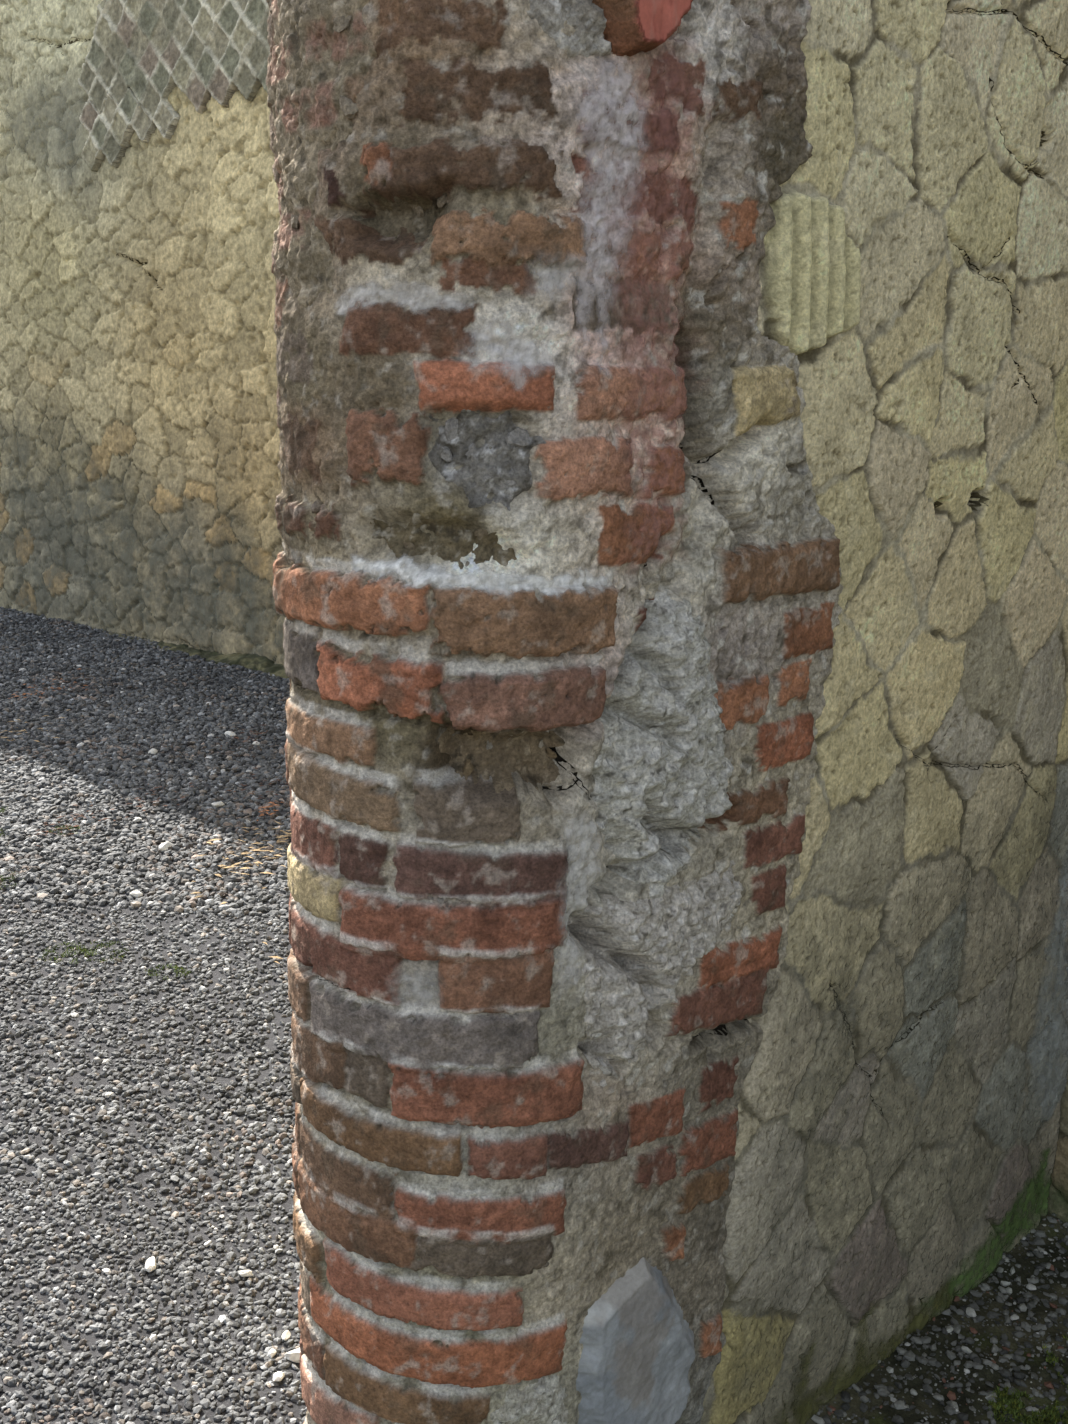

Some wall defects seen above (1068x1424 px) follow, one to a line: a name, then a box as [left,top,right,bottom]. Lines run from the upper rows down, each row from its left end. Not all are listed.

peeling [526,0,693,58]
peeling [79,87,156,172]
spalling [267,0,377,308]
spalling [351,192,448,243]
spalling [428,409,546,511]
spalling [370,513,517,569]